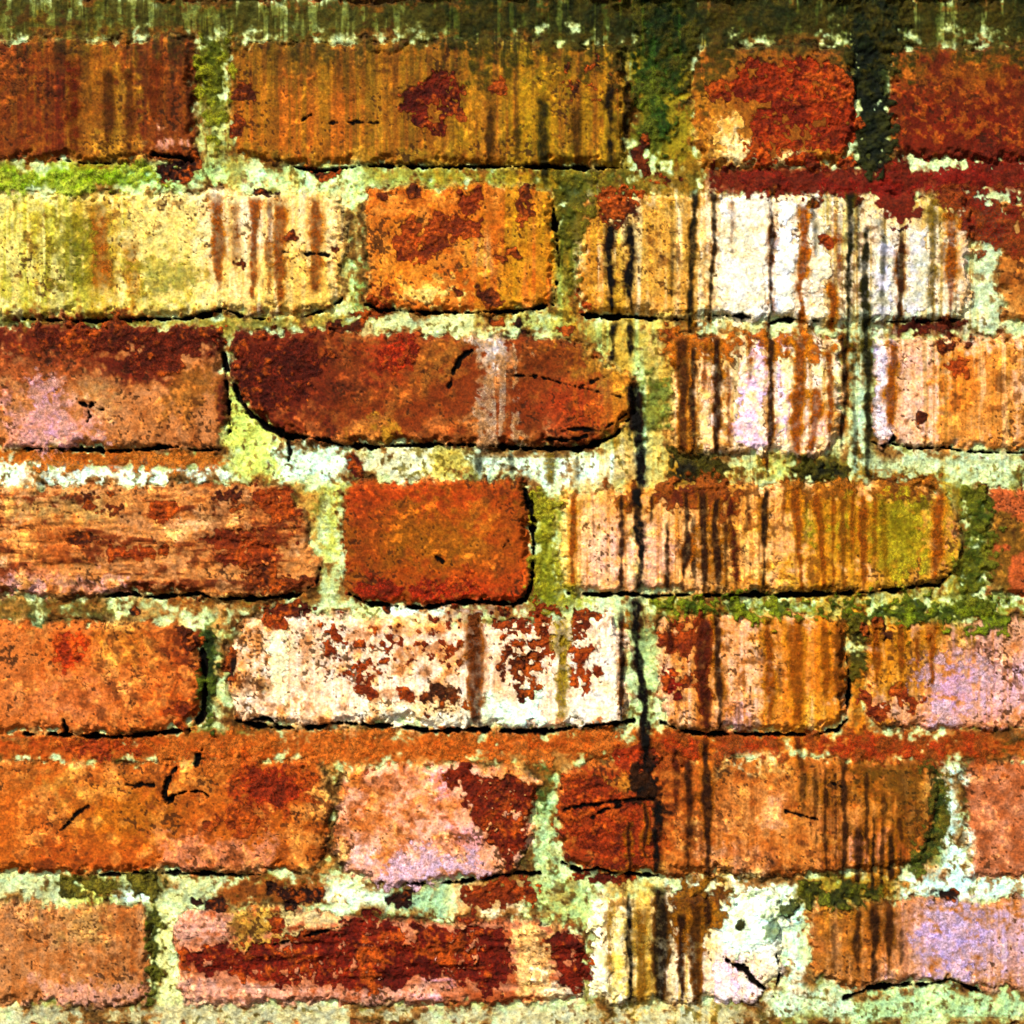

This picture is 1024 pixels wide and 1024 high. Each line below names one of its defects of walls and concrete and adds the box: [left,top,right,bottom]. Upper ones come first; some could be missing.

corrosion [209,198,289,302]
corrosion [308,196,327,291]
corrosion [658,322,856,366]
crack [24,349,635,462]
corrosion [602,468,744,531]
water stain [662,489,770,591]
water stain [463,614,486,724]
water stain [616,383,715,875]
crack [23,647,209,804]
crack [99,869,261,877]
water stain [605,887,714,1002]
crack [723,953,781,997]